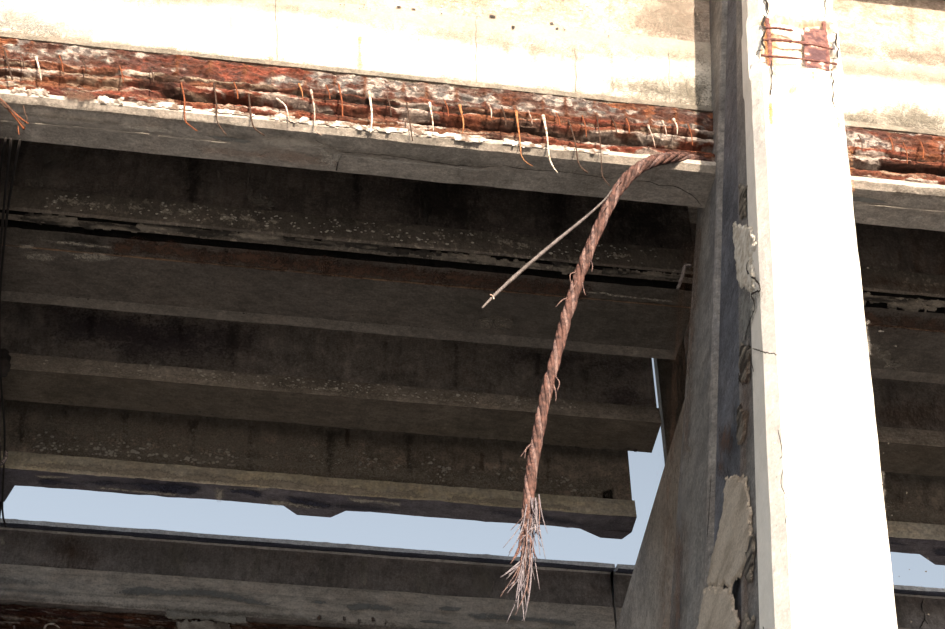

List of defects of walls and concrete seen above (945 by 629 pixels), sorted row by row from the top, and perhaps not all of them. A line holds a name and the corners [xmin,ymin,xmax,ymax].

crack [756,0,773,97]
crack [824,0,839,108]
spalling [0,38,715,186]
spalling [844,127,945,185]
spalling [696,473,756,629]
spalling [0,604,345,629]